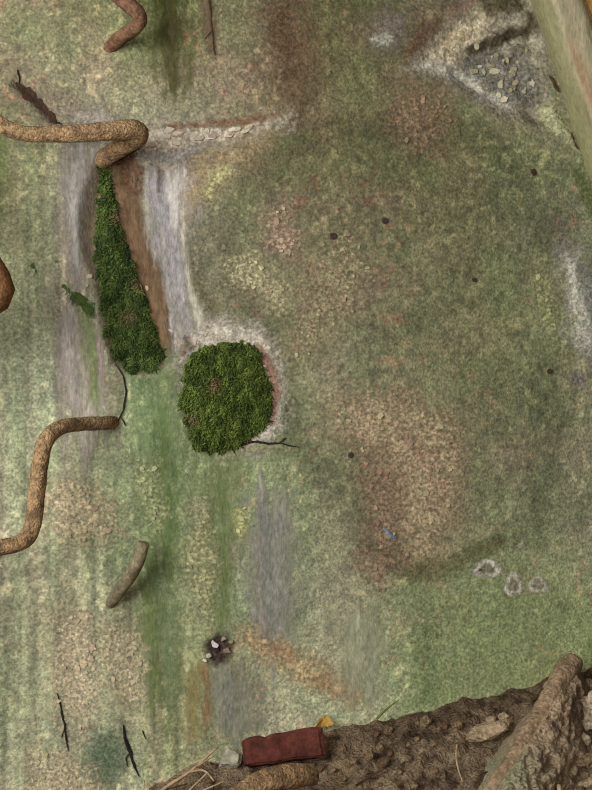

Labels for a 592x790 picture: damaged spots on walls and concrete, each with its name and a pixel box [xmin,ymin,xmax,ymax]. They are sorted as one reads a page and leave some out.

damp [145,131,288,459]
damp [555,221,592,363]